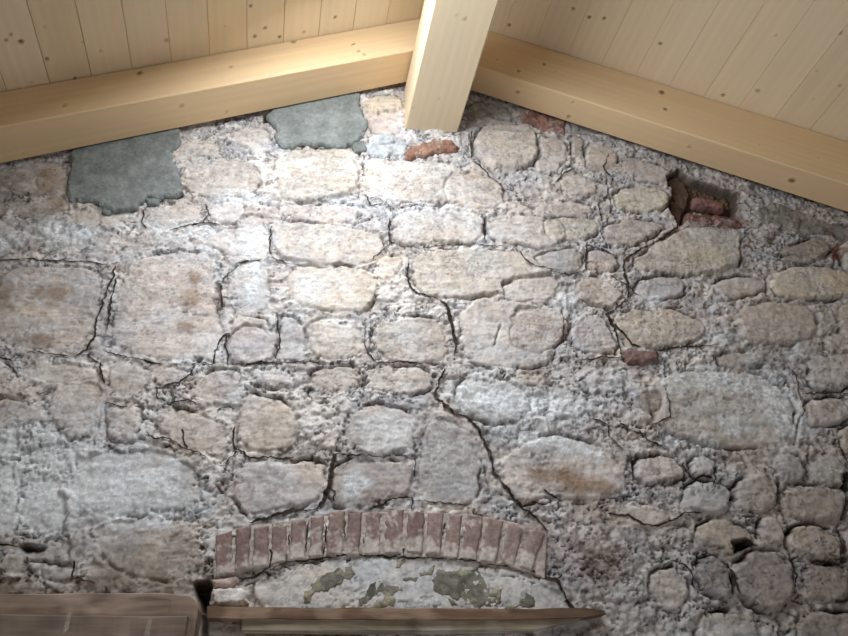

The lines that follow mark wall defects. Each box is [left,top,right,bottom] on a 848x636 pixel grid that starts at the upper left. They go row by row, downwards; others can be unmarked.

crack [470,131,508,192]
spalling [667,178,742,229]
crack [219,228,302,308]
crack [0,258,309,408]
crack [364,196,679,535]
crack [592,345,712,464]
crack [146,429,207,458]
crack [217,406,293,470]
crack [682,463,717,486]
crack [239,453,575,608]
crack [608,511,702,527]
crack [671,553,704,590]